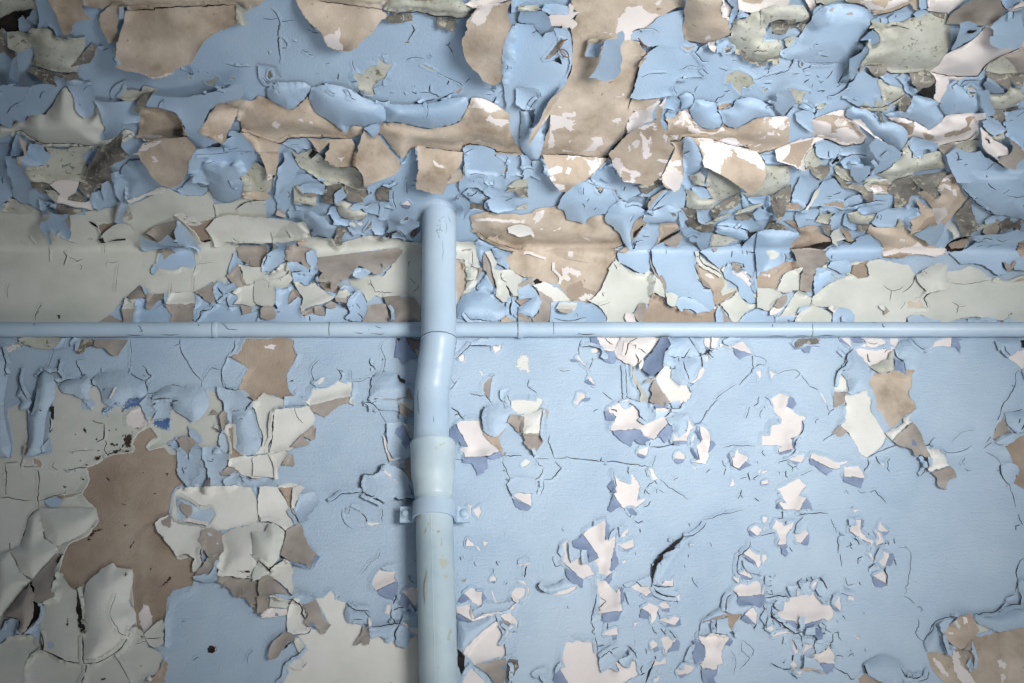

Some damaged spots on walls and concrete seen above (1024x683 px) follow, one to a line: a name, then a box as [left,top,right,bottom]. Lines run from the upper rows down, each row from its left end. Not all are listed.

peeling [0,0,65,59]
peeling [72,44,97,66]
peeling [0,79,422,322]
peeling [348,54,396,99]
peeling [447,0,1024,322]
crack [0,418,131,665]
peeling [0,337,419,683]
peeling [449,370,548,476]
peeling [510,492,535,511]
peeling [531,337,922,683]
crack [499,333,1024,683]
peeling [918,619,1024,683]